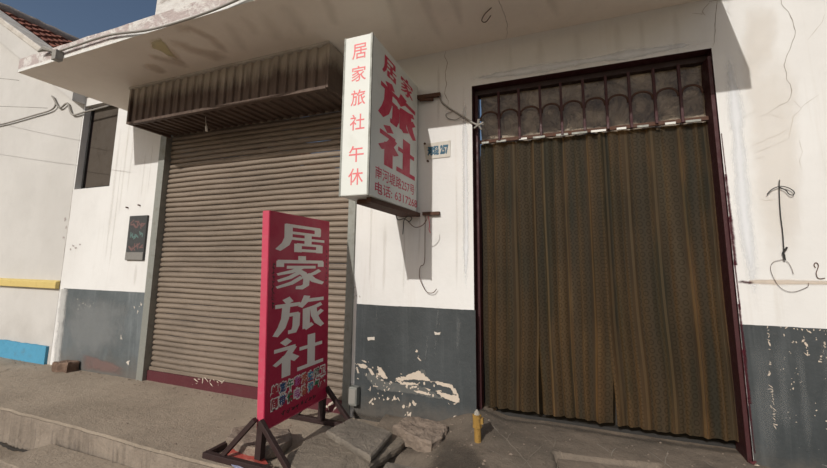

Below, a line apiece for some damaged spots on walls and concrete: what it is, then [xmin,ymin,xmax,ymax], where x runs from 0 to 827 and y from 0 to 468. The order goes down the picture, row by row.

crack [730,2,824,166]
peeling [355,349,460,417]